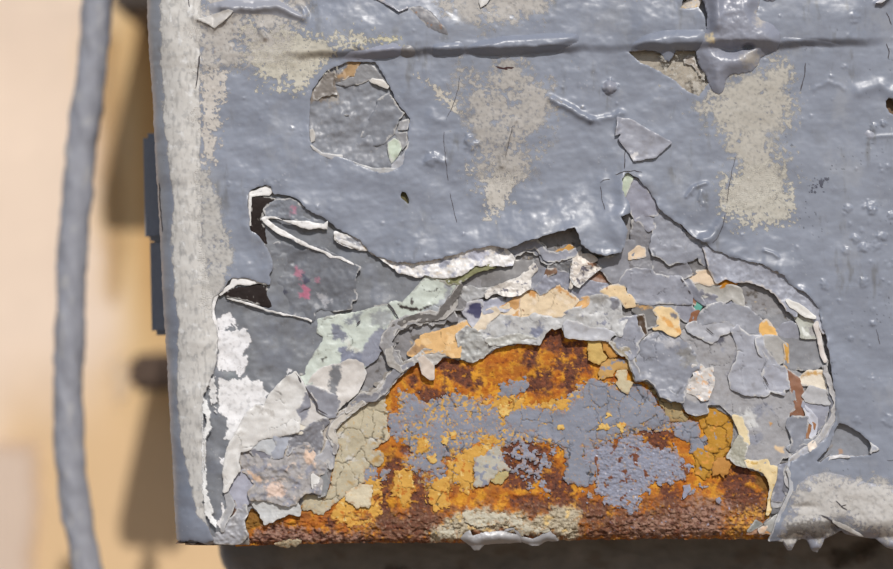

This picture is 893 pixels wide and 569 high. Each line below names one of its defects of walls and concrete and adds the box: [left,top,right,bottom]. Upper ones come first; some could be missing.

peeling [197,9,233,28]
peeling [615,117,672,162]
corrosion [235,328,770,548]
peeling [203,173,880,546]